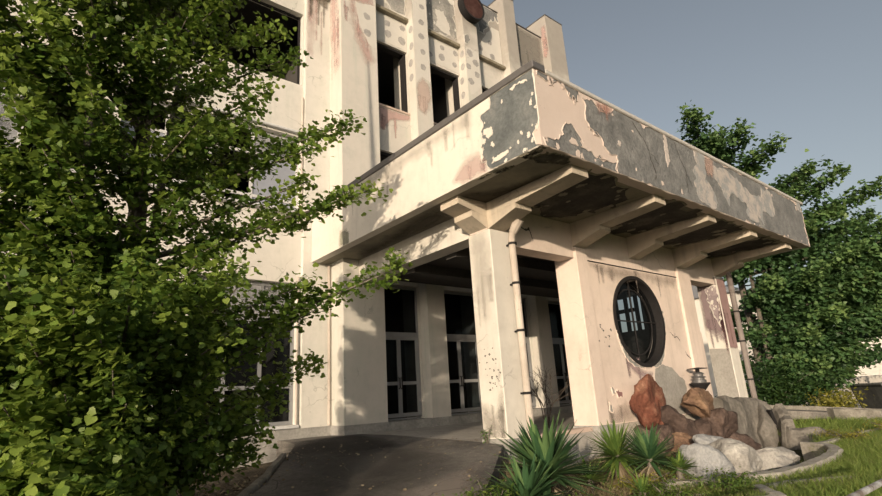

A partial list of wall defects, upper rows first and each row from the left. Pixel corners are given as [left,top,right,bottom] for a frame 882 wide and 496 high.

leakage [418,80,430,112]
leakage [379,106,409,138]
peeling [355,0,809,258]